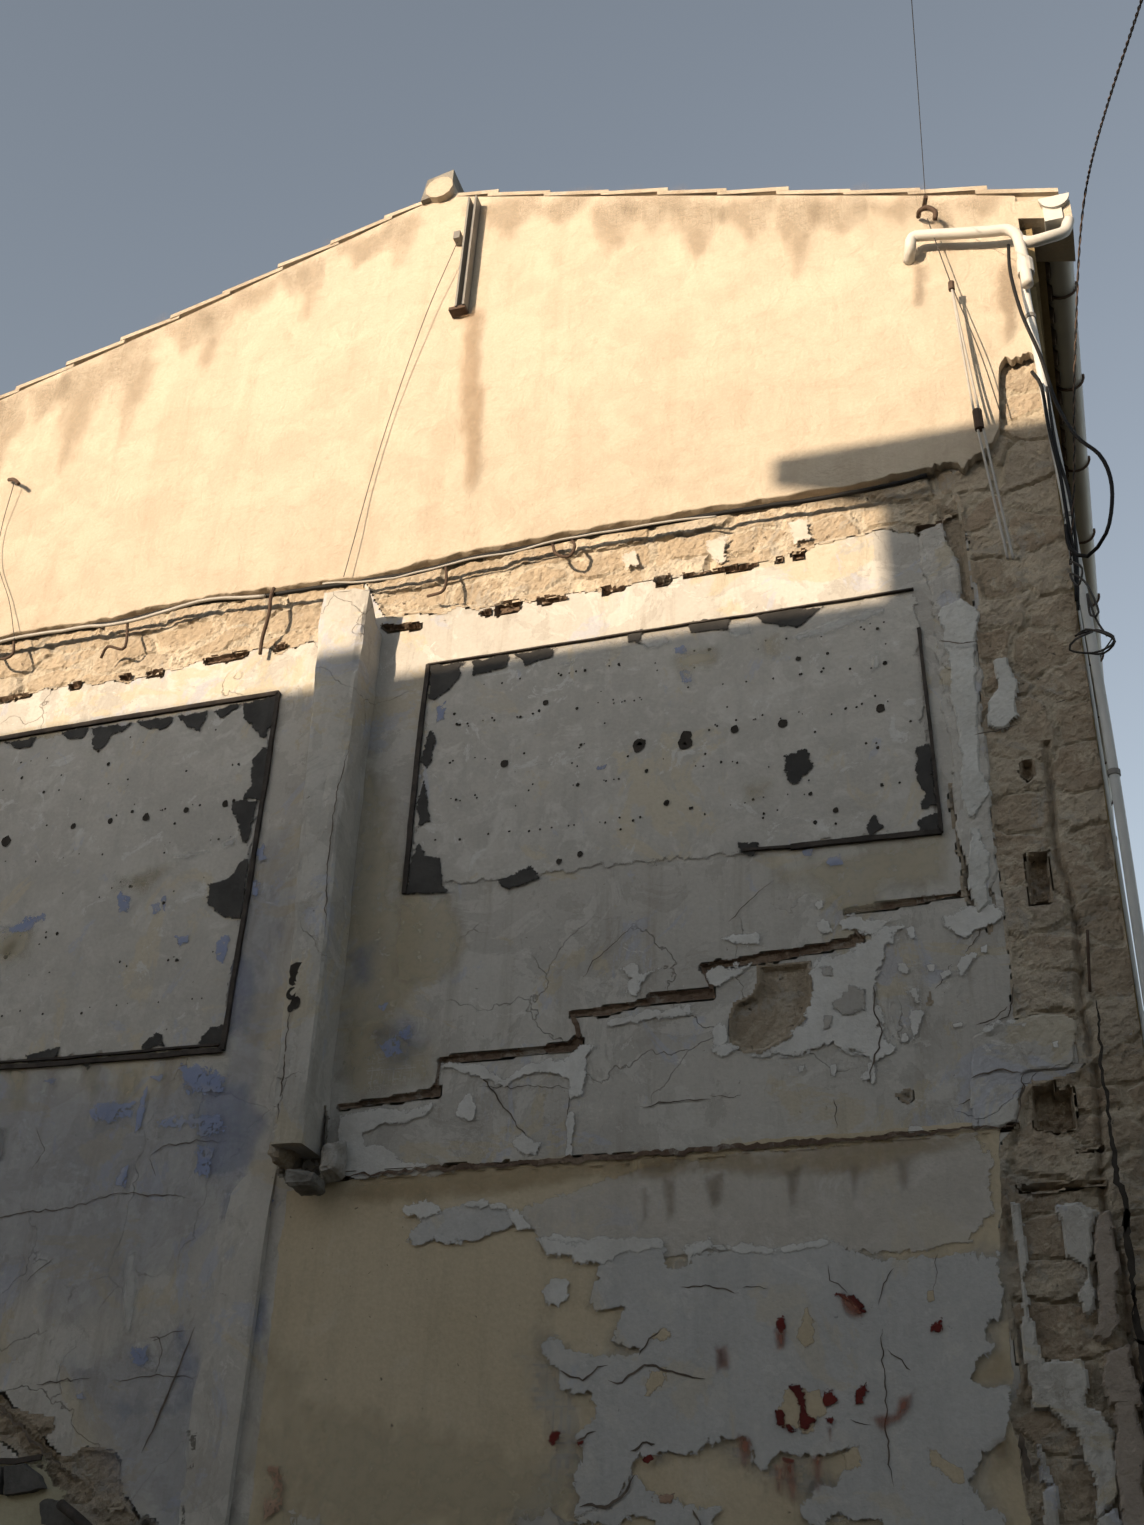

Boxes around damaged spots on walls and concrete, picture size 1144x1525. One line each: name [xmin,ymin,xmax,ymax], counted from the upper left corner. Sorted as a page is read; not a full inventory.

peeling [0,359,1144,1525]
crack [38,1327,195,1451]
crack [828,1268,910,1485]